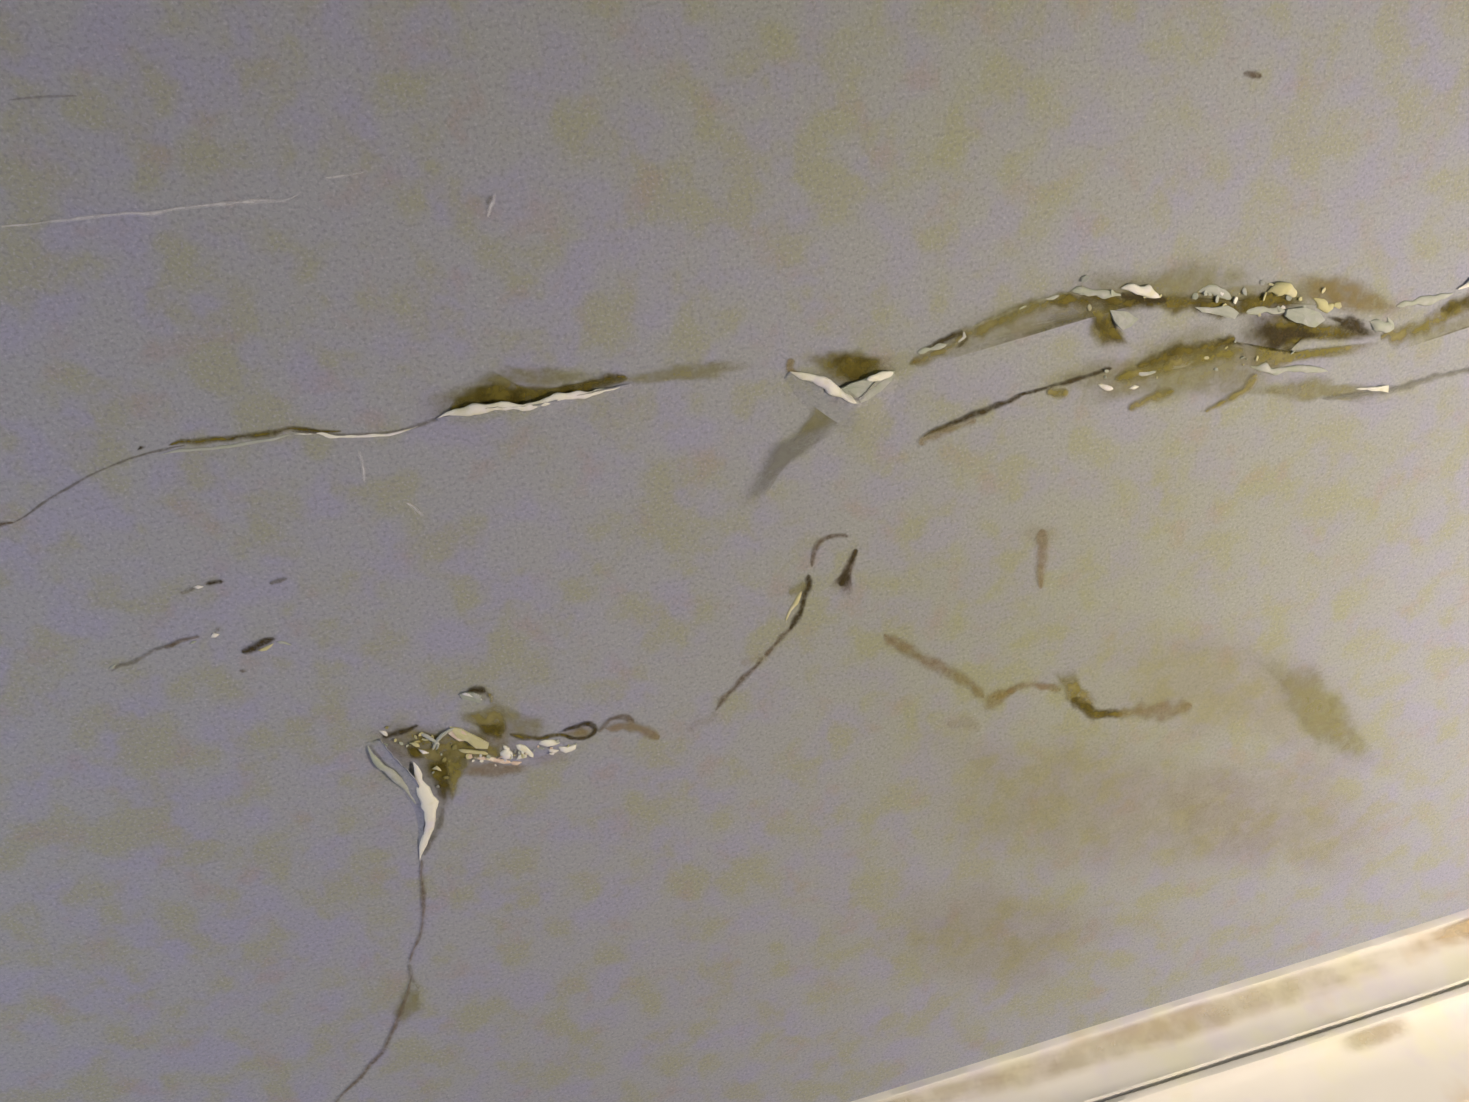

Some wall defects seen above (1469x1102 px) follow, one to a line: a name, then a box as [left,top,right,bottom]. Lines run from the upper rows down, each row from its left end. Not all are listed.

crack [0,365,717,526]
peeling [762,272,1469,484]
crack [109,632,219,669]
crack [181,580,222,593]
crack [718,534,858,707]
flaking render [366,687,659,858]
crack [336,861,425,1102]